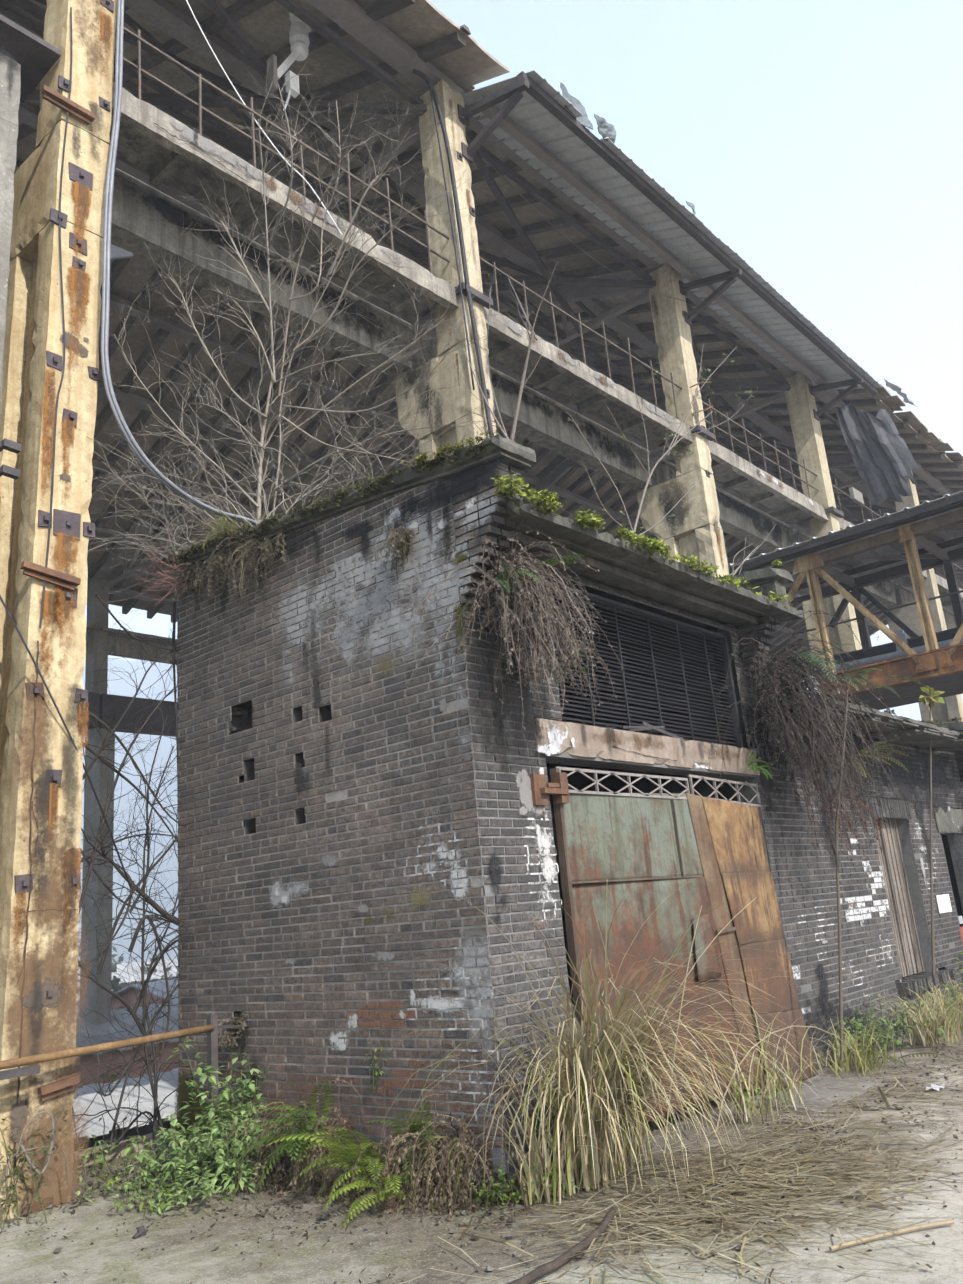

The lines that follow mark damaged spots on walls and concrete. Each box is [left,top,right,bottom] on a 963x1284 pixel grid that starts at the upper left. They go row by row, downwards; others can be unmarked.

rust [101,12,112,69]
rust [42,181,91,496]
damp [182,495,550,769]
flaking render [538,724,575,756]